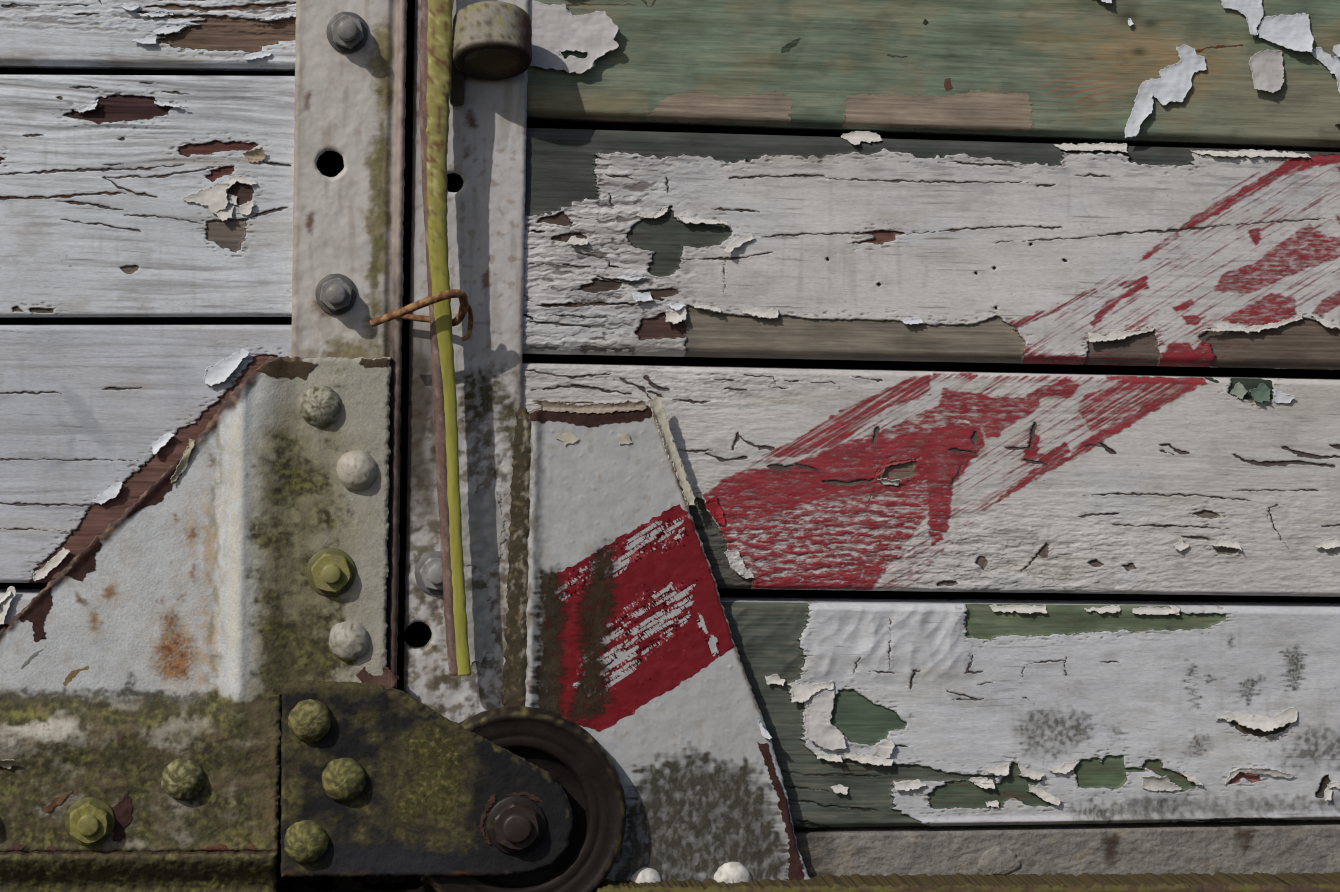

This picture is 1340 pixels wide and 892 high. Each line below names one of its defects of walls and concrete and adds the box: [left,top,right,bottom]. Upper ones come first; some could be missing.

peeling [120,0,296,60]
peeling [1221,0,1340,93]
peeling [525,45,1340,246]
peeling [523,205,1026,364]
crack [0,388,62,396]
crack [0,502,115,531]
crack [0,455,138,463]
peeling [0,349,278,642]
crack [941,422,1048,496]
crack [1079,443,1340,550]
rust [157,615,192,679]
peeling [684,495,1226,828]